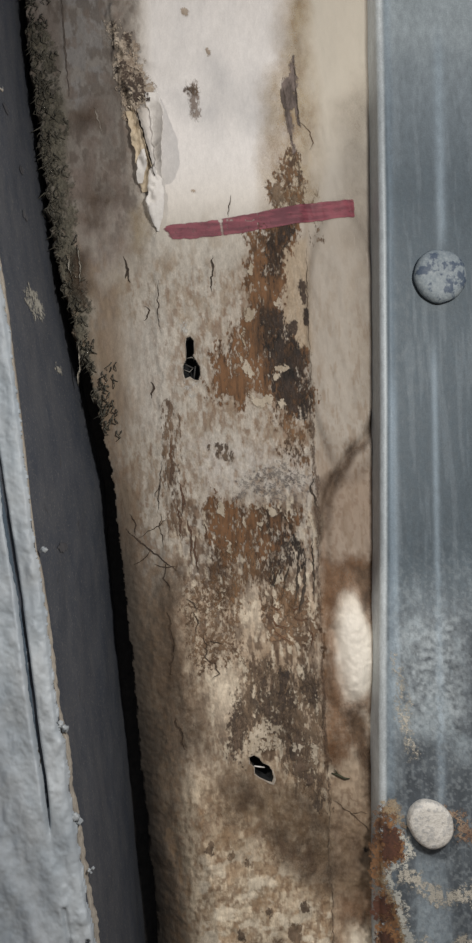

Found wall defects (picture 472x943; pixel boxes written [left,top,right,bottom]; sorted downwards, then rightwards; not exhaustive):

peeling [104,19,165,231]
crack [280,55,314,154]
peeling [202,222,320,475]
damp [233,442,366,538]
peeling [177,487,334,814]
corrosion [368,799,472,943]